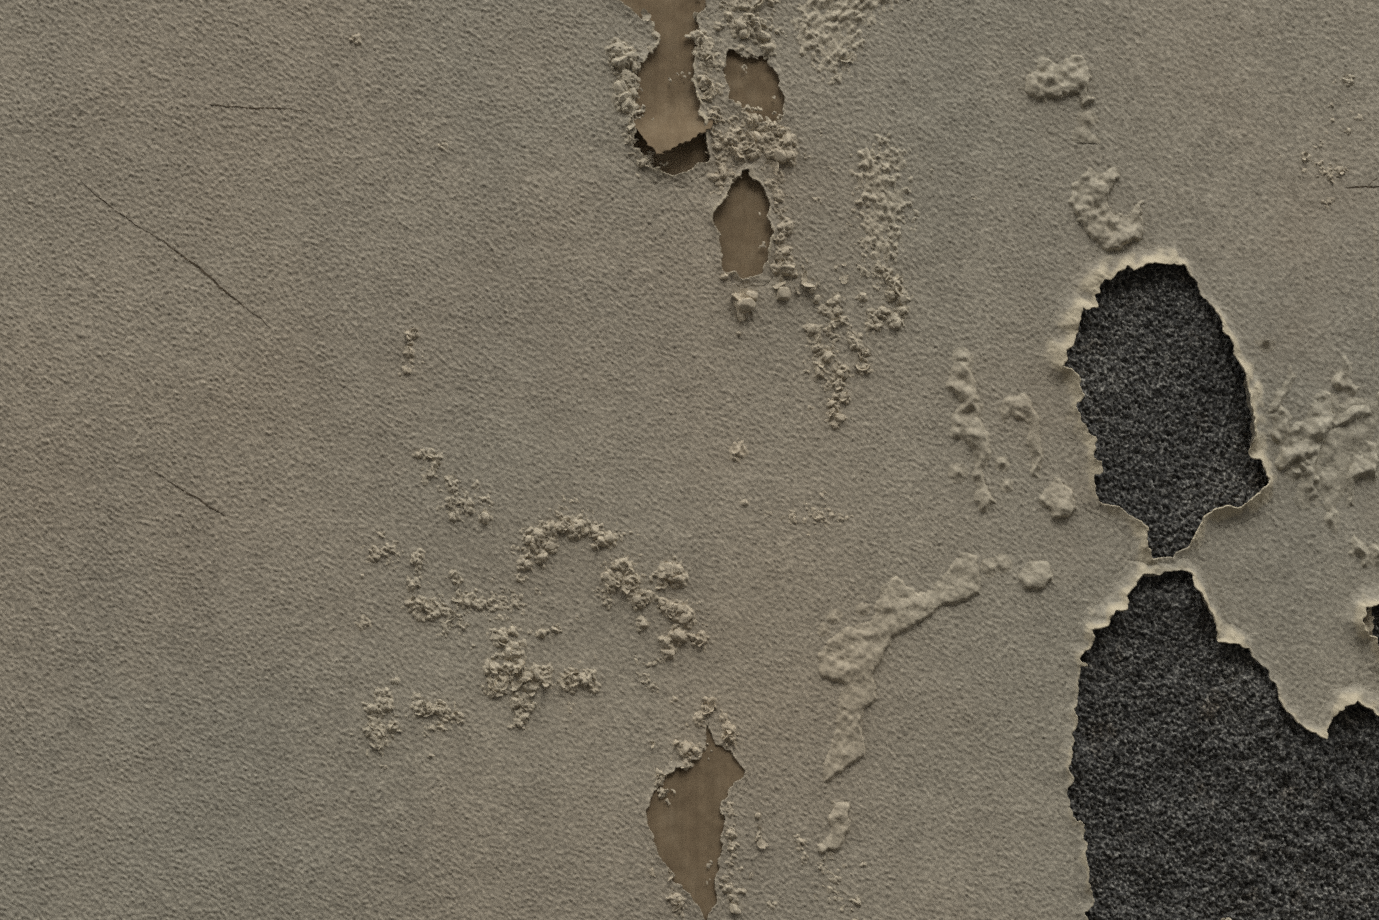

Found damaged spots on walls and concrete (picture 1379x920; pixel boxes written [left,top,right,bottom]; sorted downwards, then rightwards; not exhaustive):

peeling [604,0,834,336]
spalling [1064,263,1379,920]
peeling [639,696,768,920]